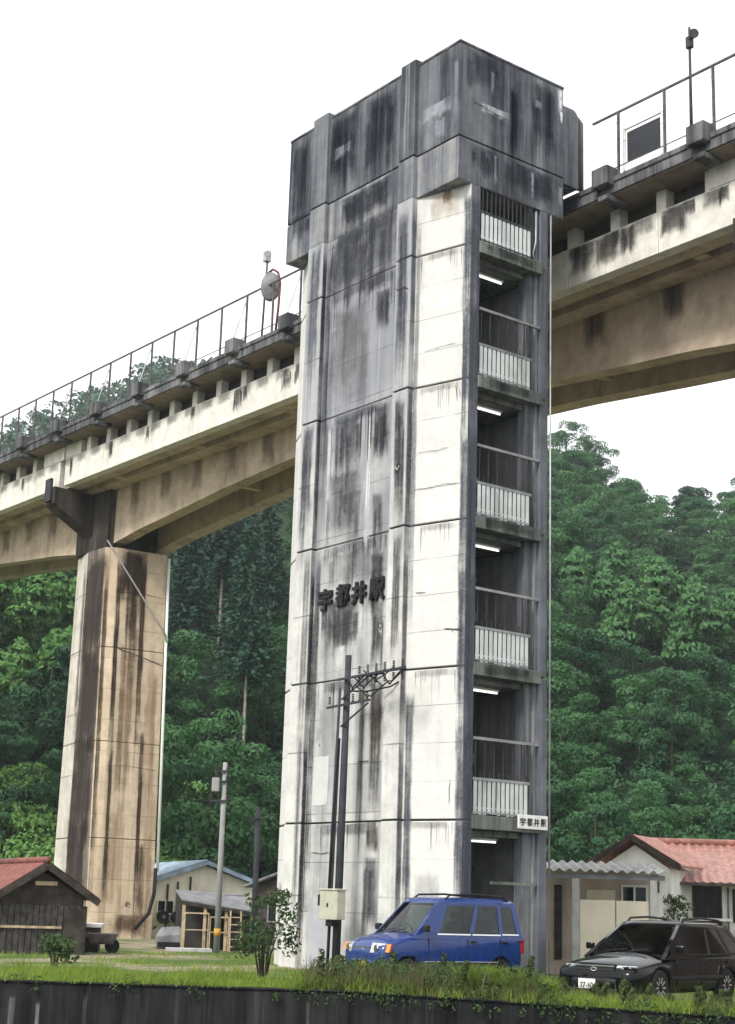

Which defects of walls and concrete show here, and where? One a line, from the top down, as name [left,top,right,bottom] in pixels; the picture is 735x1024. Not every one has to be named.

water stain [482,92,517,145]
water stain [463,199,481,291]
water stain [571,199,695,271]
water stain [233,386,247,407]
water stain [301,175,420,541]
water stain [462,308,479,402]
water stain [457,440,476,707]
water stain [67,553,147,886]
water stain [116,735,144,933]
water stain [298,572,381,922]
water stain [392,541,413,900]
water stain [454,734,472,898]